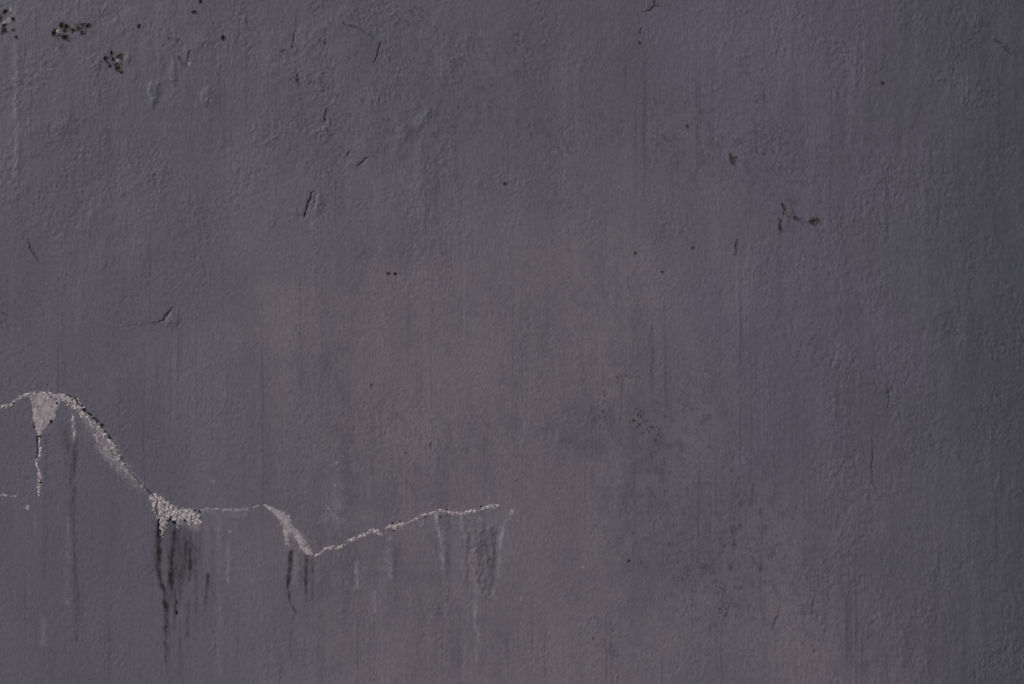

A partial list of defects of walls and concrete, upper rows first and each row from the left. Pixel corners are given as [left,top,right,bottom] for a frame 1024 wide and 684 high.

crack [0,391,152,495]
crack [201,503,264,511]
crack [314,504,501,556]
leakage [157,531,178,628]